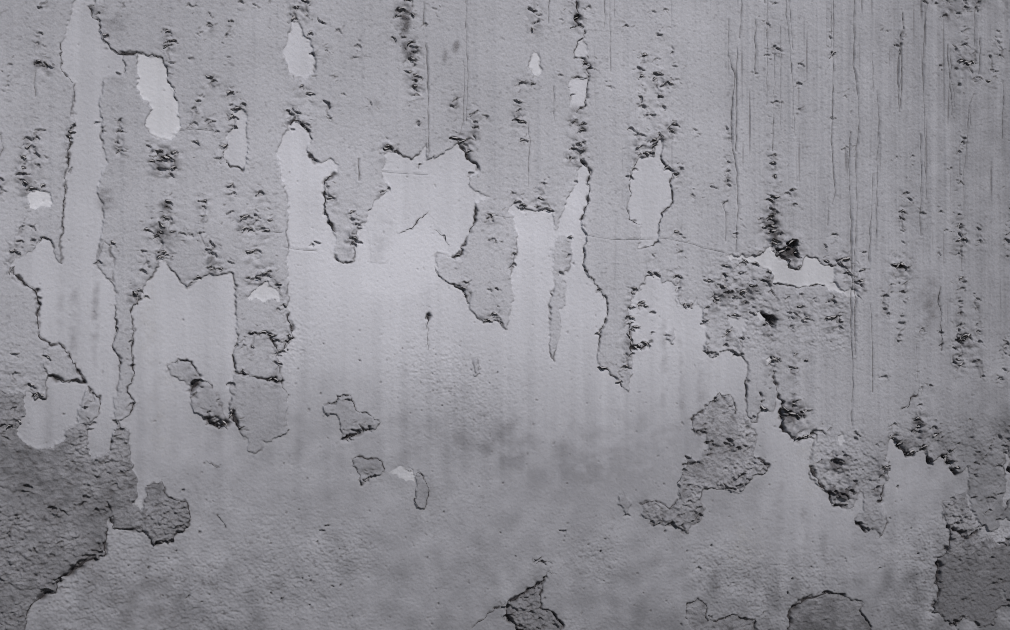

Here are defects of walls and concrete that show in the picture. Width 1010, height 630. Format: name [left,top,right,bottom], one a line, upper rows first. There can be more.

peeling [136,23,251,184]
peeling [182,0,280,65]
peeling [284,104,315,132]
peeling [283,0,335,103]
peeling [387,0,442,104]
peeling [511,52,542,149]
peeling [526,0,547,39]
peeling [565,78,589,112]
peeling [574,38,596,76]
peeling [634,45,683,124]
peeling [0,0,190,630]
peeling [25,114,1010,630]